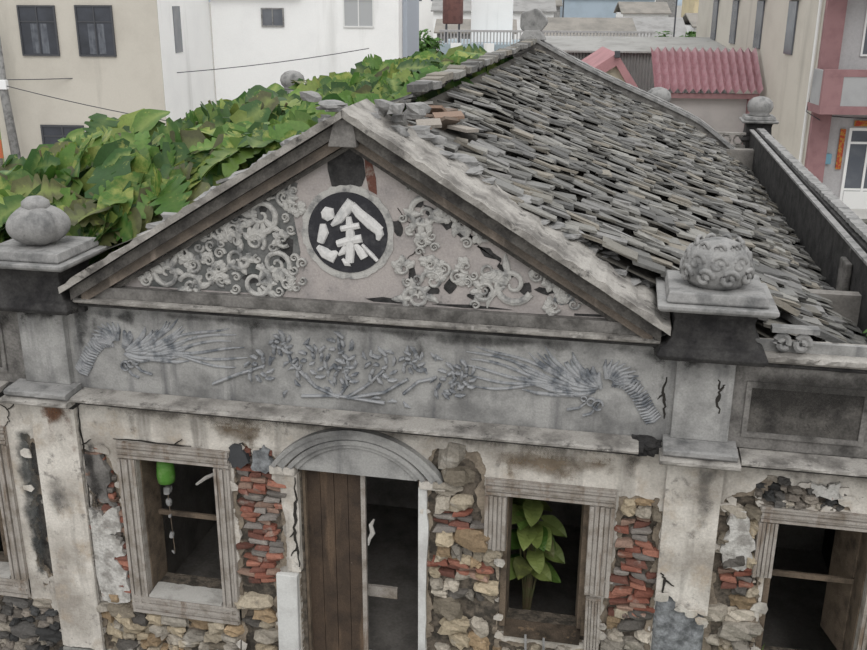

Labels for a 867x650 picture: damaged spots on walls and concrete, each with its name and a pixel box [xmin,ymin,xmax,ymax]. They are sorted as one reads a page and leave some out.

spalling [83,442,291,650]
spalling [420,442,583,650]
spalling [599,498,662,650]
spalling [703,475,859,650]